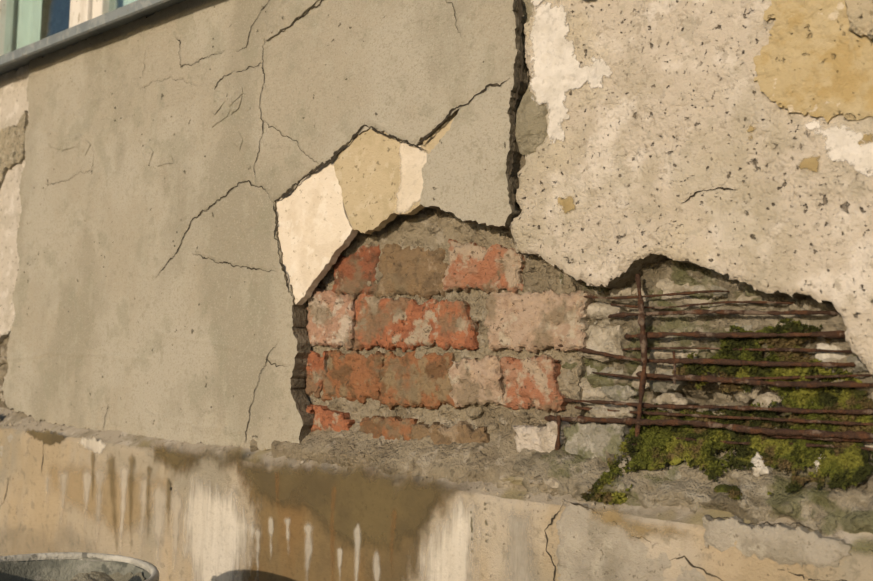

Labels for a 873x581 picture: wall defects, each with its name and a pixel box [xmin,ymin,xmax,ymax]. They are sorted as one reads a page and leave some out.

flaking render [0,94,28,129]
crack [158,0,524,296]
peeling [753,0,873,124]
flaking render [0,166,25,320]
crack [244,344,287,448]
flaking render [271,116,634,496]
corrosion [544,274,873,451]
water stain [47,437,487,581]
crack [544,501,656,581]
crack [669,556,723,581]
crack [704,515,820,531]
crack [777,569,847,581]